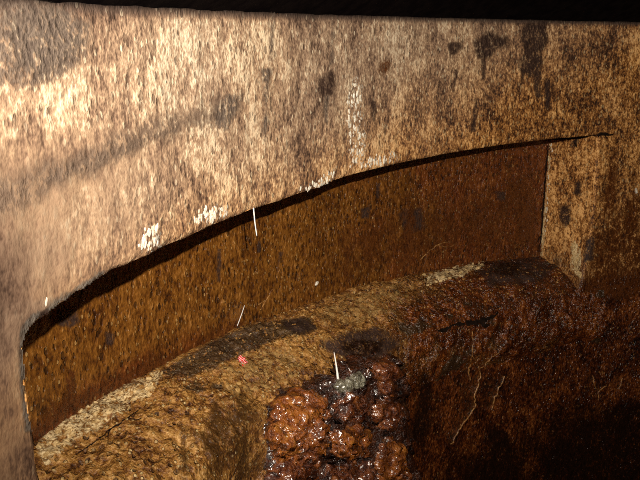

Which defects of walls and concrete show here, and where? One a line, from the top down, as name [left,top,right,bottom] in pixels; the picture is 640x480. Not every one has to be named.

water stain [474,32,507,79]
water stain [518,22,550,109]
water stain [318,71,334,119]
water stain [346,78,395,168]
efflorescence [138,223,159,251]
efflorescence [194,205,227,224]
water stain [284,318,316,335]
water stain [322,328,397,359]
crack [438,311,505,444]